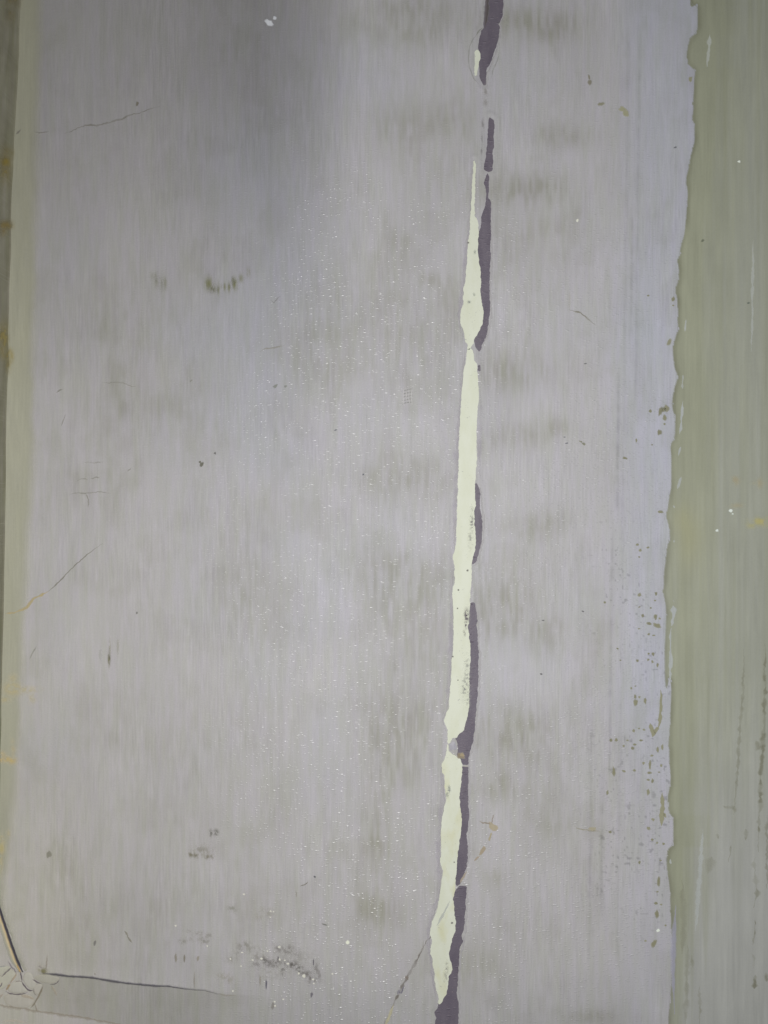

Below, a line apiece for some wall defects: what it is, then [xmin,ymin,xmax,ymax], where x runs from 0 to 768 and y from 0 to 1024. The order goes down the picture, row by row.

peeling [468,0,505,104]
crack [0,902,213,993]
peeling [427,118,498,1024]
peeling [609,0,768,1024]